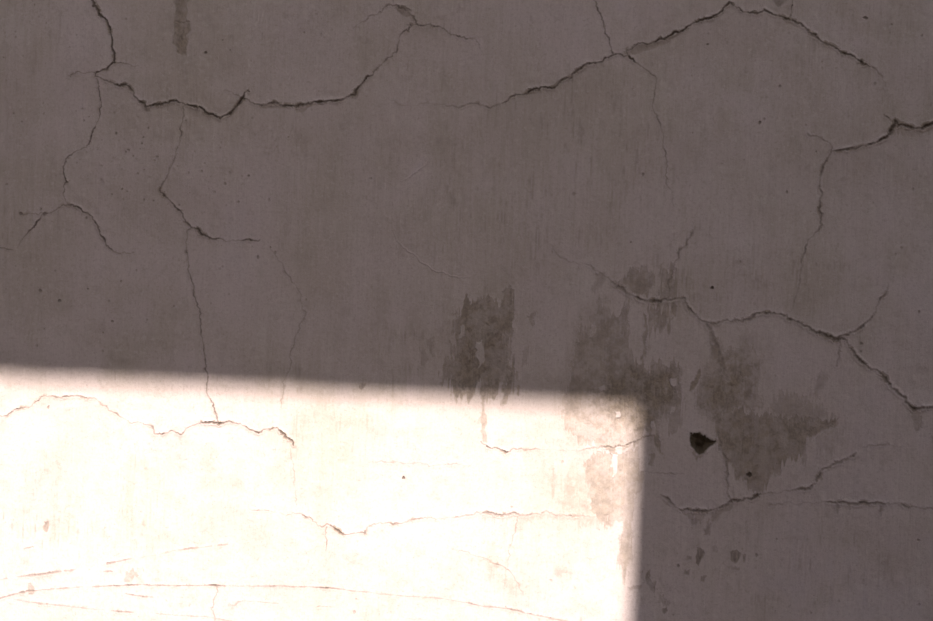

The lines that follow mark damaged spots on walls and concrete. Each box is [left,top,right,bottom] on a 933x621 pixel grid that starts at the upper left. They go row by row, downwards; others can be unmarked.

crack [385,0,887,207]
crack [0,0,600,595]
leakage [476,294,607,531]
crack [480,434,655,455]
peeling [568,262,844,614]
crack [549,113,933,412]
crack [640,437,933,518]